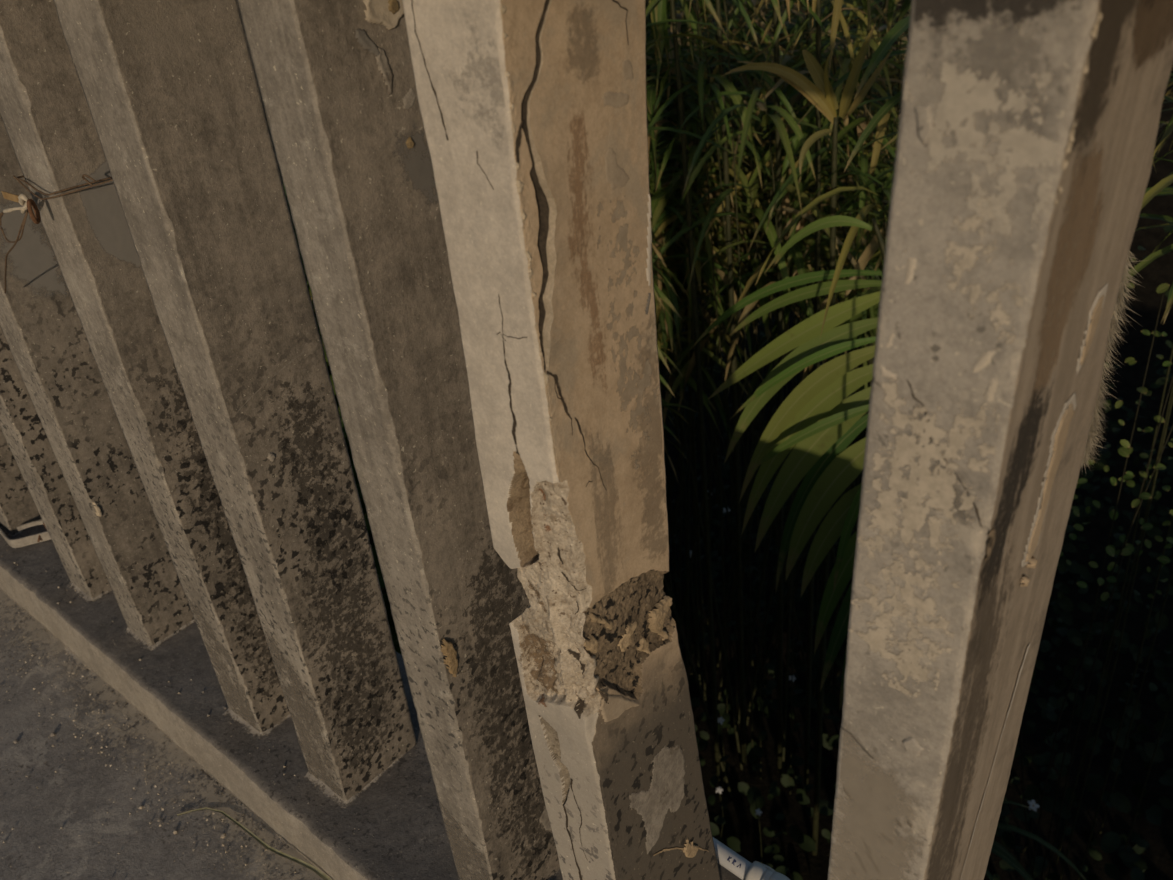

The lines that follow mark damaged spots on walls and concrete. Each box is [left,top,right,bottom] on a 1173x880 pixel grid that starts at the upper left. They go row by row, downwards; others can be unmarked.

peeling [363,0,404,30]
crack [411,0,448,140]
crack [612,0,629,44]
crack [497,0,607,491]
peeling [849,58,1088,697]
spalling [506,452,676,805]
crack [563,779,588,880]
peeling [629,744,685,854]